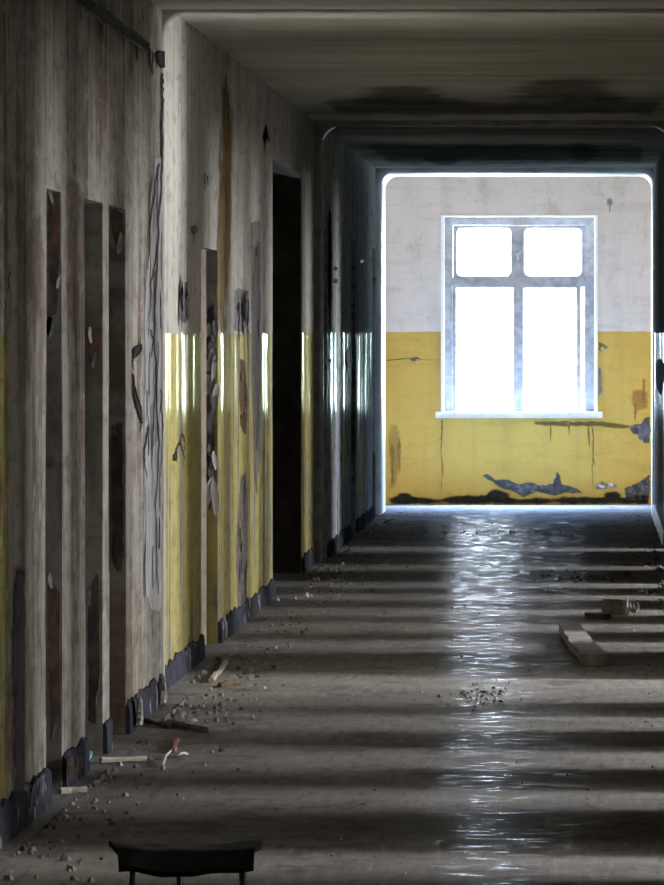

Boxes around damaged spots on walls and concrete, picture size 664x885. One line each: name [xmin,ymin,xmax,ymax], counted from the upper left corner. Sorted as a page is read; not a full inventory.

leakage [535,421,628,447]
peeling [630,417,651,443]
leakage [390,489,649,505]
peeling [483,473,581,497]
peeling [596,475,650,498]